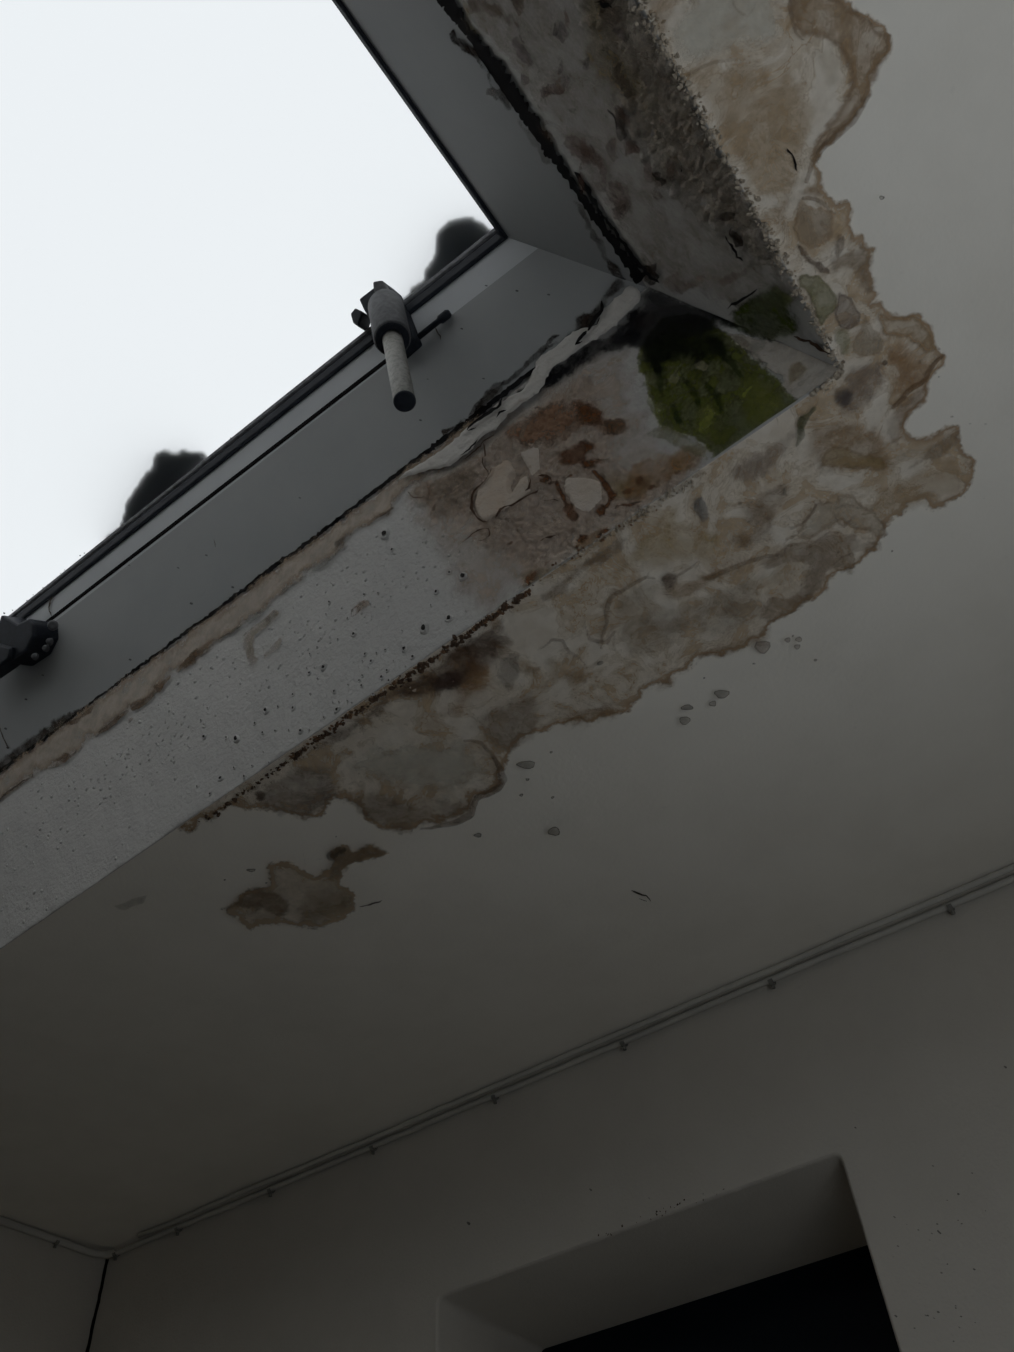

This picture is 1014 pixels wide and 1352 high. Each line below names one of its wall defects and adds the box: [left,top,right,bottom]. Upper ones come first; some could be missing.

flaking render [572,0,845,399]
flaking render [191,286,709,831]
water stain [0,0,975,837]
water stain [227,836,387,930]
crack [85,1259,109,1352]